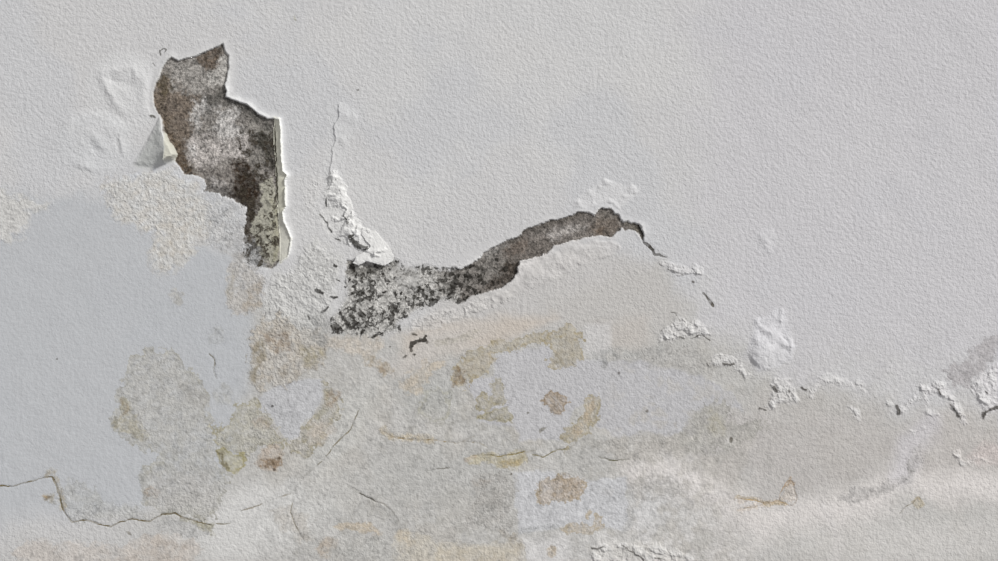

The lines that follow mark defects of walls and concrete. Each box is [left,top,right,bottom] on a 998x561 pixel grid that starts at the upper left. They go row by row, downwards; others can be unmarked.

peeling [128,37,299,271]
peeling [319,168,653,339]
leakage [9,182,714,561]
crack [0,410,359,538]
leakage [559,392,770,534]